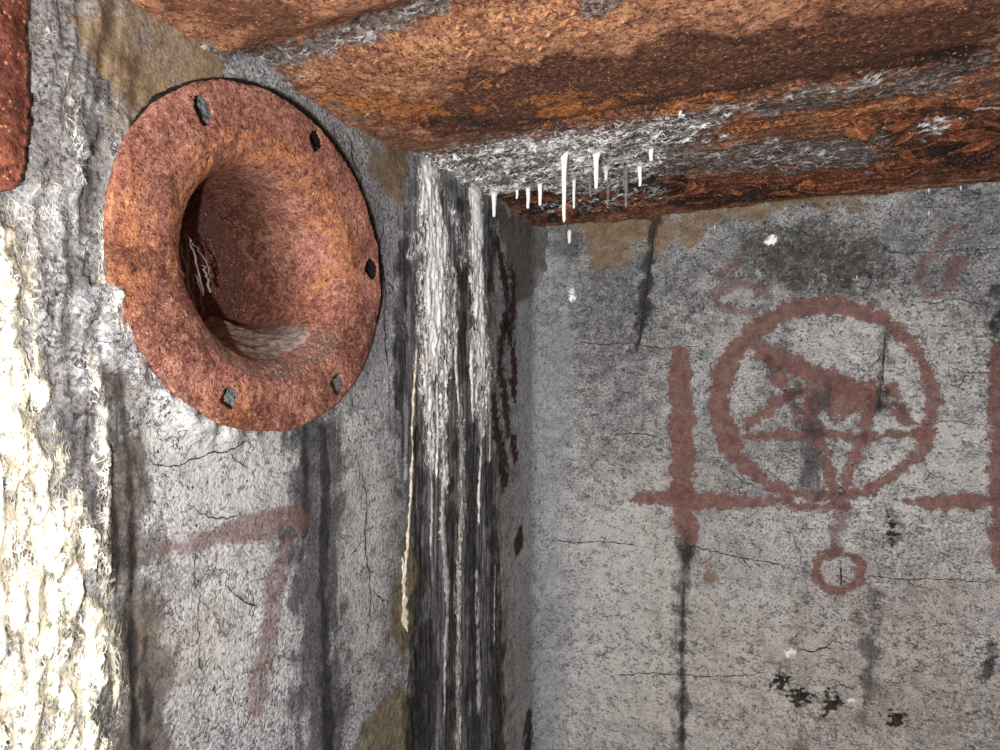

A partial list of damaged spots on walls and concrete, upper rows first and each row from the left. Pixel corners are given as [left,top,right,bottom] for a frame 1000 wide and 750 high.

corrosion [453,19,481,59]
corrosion [496,4,589,52]
corrosion [728,97,1000,196]
corrosion [519,189,648,221]
corrosion [655,181,715,204]
corrosion [490,230,518,495]
crack [858,338,886,398]
damp [356,66,917,750]
crack [148,438,249,469]
damp [279,420,349,750]